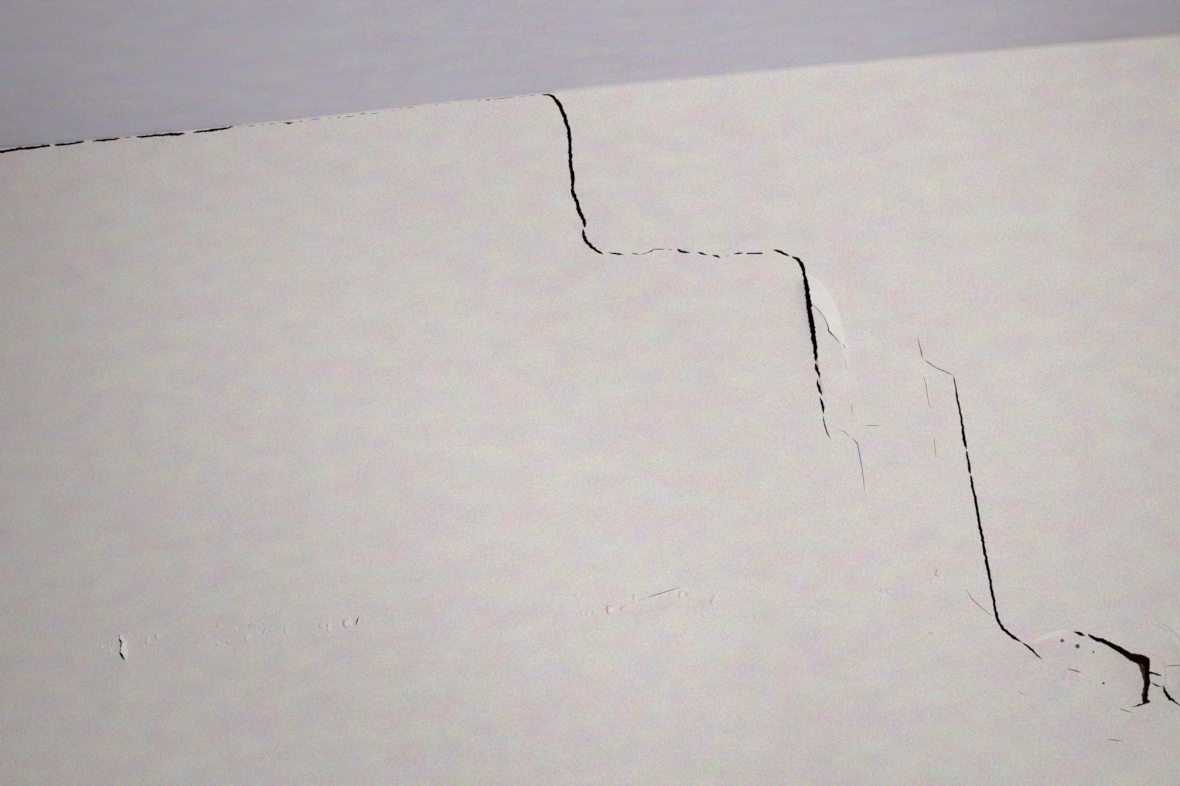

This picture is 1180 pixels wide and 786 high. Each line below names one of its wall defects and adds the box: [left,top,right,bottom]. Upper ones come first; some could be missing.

crack [0,103,448,153]
crack [479,94,878,490]
crack [918,340,1041,659]